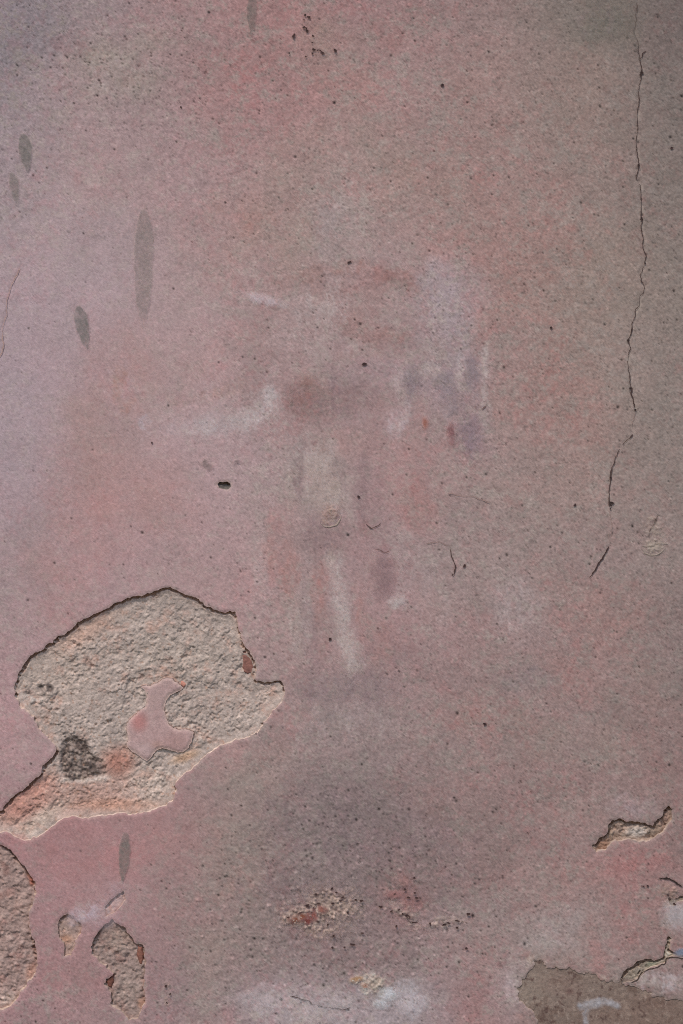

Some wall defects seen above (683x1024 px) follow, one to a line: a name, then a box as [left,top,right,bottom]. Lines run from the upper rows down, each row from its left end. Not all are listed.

crack [590,3,647,577]
flaking render [0,587,285,1020]
peeling [517,936,683,1024]
flaking render [592,806,672,852]